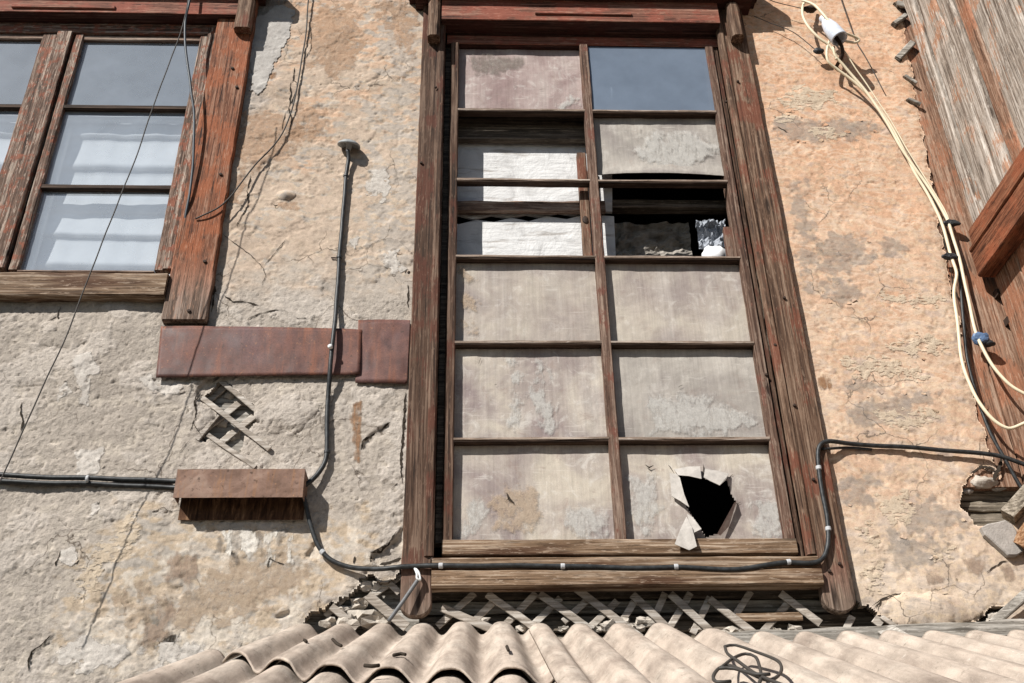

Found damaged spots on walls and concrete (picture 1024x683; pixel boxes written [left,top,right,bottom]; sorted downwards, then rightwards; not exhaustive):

crack [211,175,300,319]
corrosion [351,401,362,462]
spalling [960,475,1017,526]
spalling [303,569,420,647]